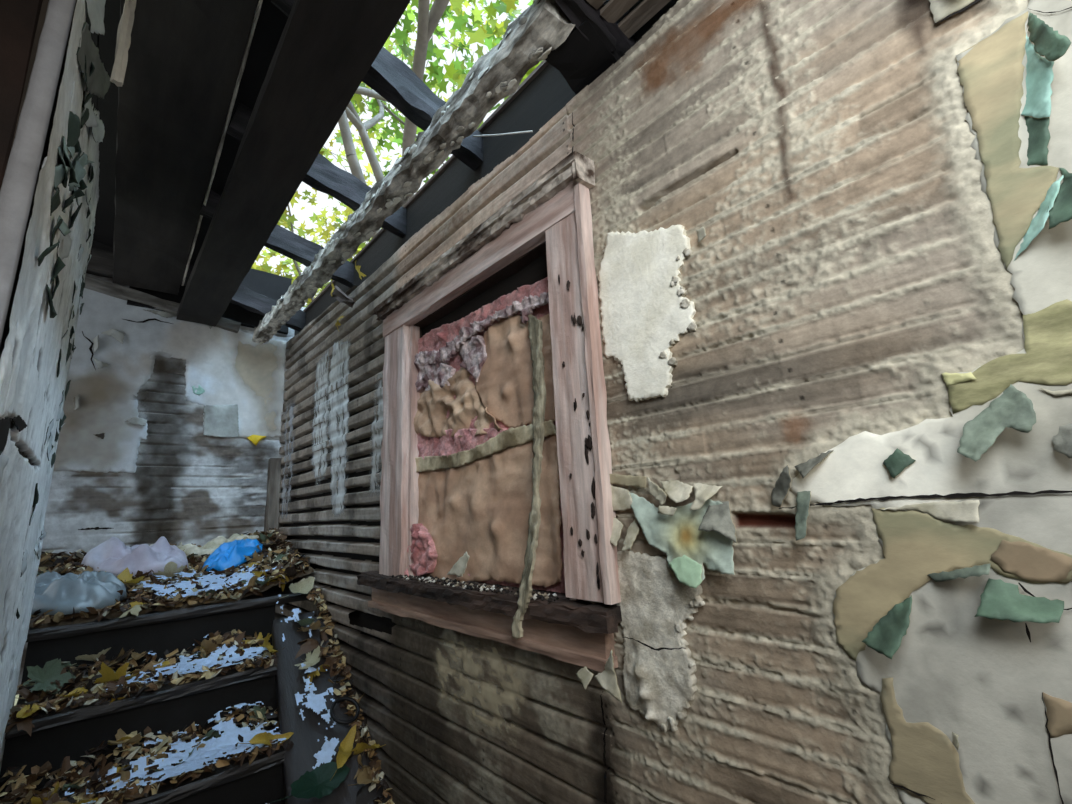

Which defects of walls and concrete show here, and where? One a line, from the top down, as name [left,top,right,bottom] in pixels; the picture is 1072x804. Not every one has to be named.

crack [935,0,980,24]
peeling [37,0,172,468]
flaking render [598,225,706,402]
peeling [21,483,46,577]
damp [133,356,189,546]
damp [234,340,294,517]
damp [312,341,350,513]
damp [370,375,383,492]
peeling [883,448,916,478]
crack [779,490,1072,509]
damp [437,642,524,730]
crack [1042,693,1064,804]